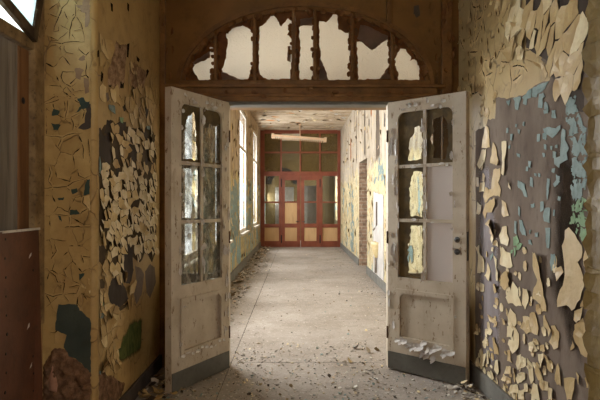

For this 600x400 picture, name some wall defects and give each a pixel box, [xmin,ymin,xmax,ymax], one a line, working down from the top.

crack [51,4,85,55]
flaking render [43,0,159,400]
crack [459,35,528,107]
flaking render [473,0,600,400]